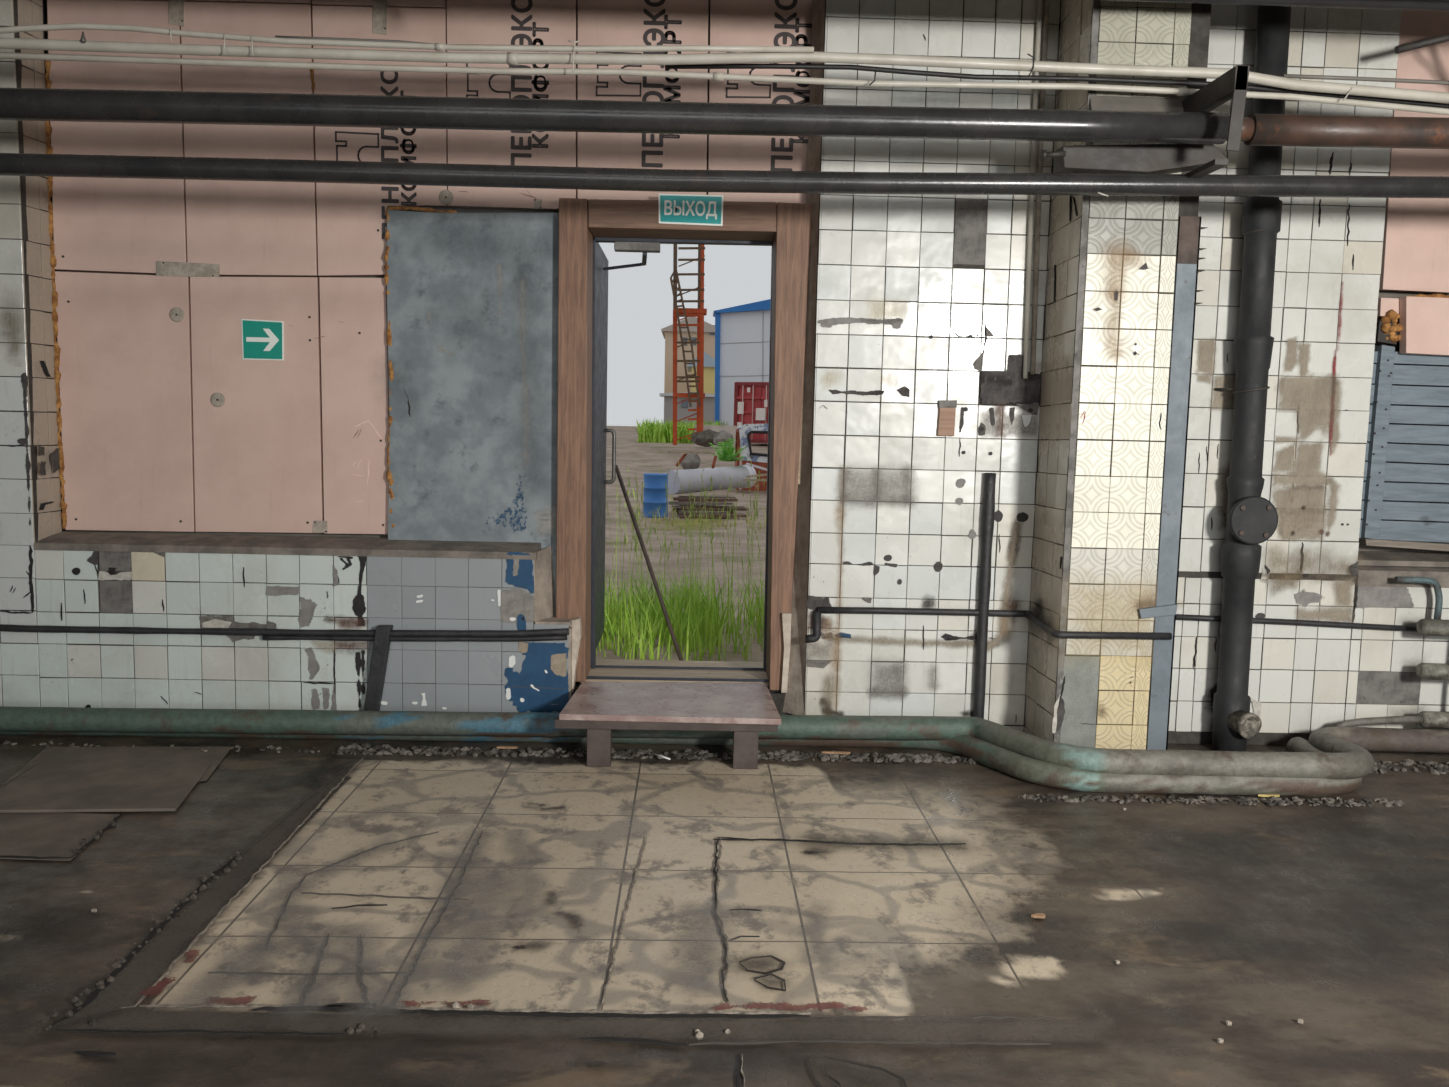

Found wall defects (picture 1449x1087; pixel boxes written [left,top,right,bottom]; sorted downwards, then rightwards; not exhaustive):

spalling [952,324,1041,457]
peeling [482,475,527,533]
peeling [72,551,133,613]
peeling [491,552,582,712]
crack [41,755,1058,1087]